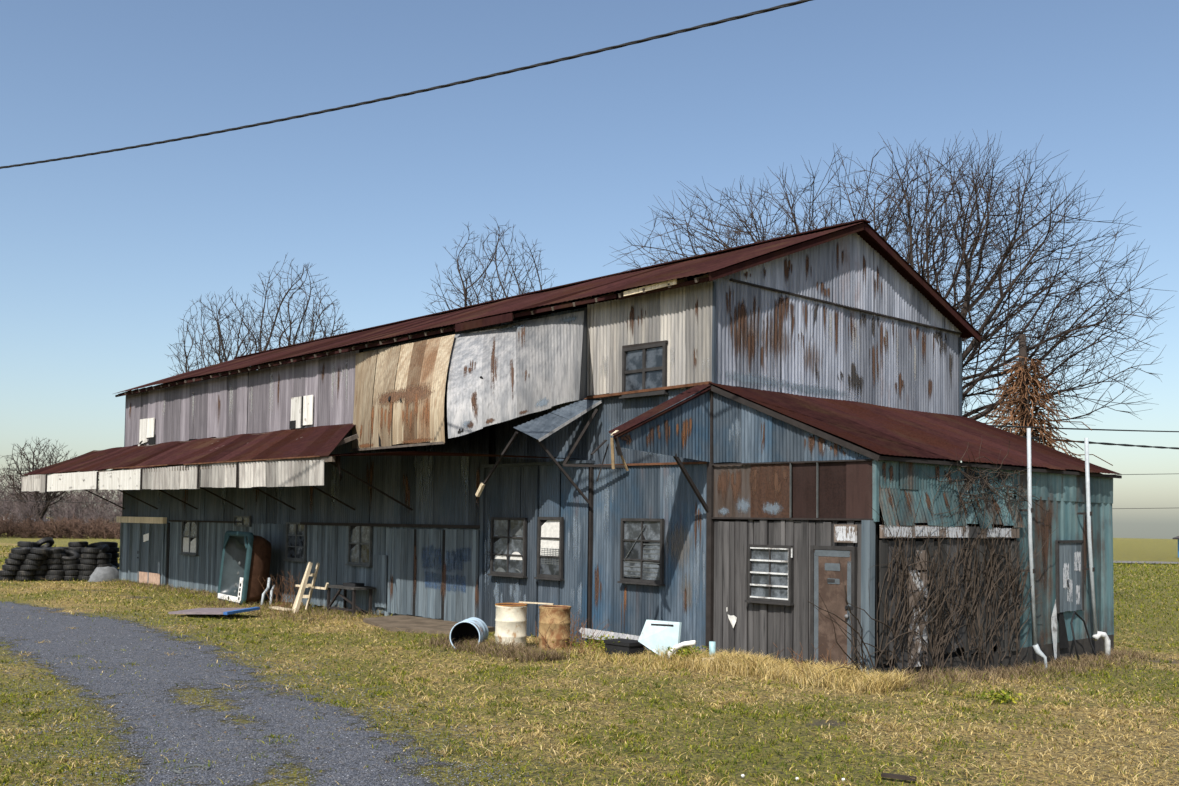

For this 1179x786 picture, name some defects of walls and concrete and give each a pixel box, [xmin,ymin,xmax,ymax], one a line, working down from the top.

corrosion [627,306,646,334]
corrosion [726,255,953,387]
corrosion [491,337,529,392]
corrosion [467,392,494,428]